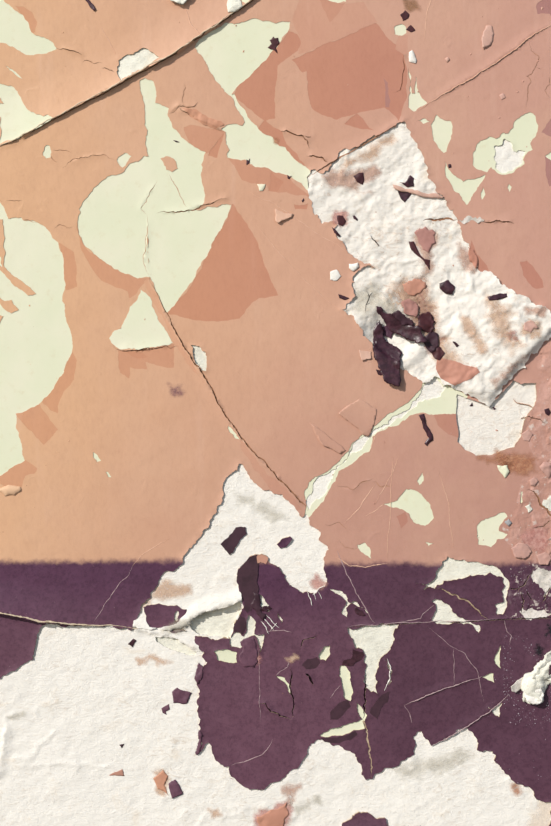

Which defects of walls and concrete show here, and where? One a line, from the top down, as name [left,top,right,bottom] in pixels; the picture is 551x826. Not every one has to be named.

peeling [0,0,56,55]
crack [0,0,253,145]
peeling [0,48,231,496]
crack [117,179,306,510]
spalling [304,122,551,621]
crack [0,612,138,629]
spalling [0,464,542,826]
crack [362,676,373,773]
peeling [511,651,551,705]